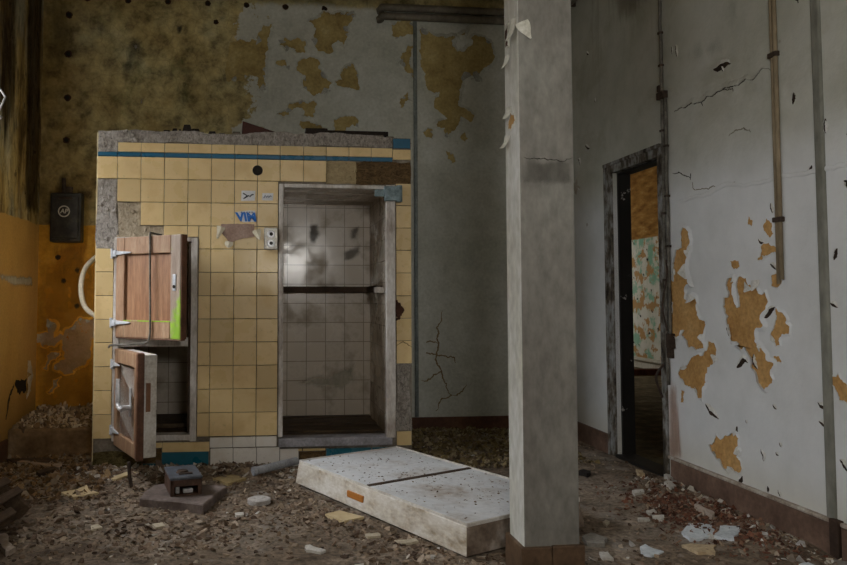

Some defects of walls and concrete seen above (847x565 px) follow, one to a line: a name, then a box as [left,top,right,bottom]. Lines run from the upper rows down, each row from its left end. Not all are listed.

water stain [1,0,16,138]
water stain [26,0,42,211]
peeling [98,10,394,152]
peeling [326,161,411,185]
peeling [390,20,510,164]
crack [674,67,770,112]
peeling [14,316,94,402]
crack [397,312,467,411]
peeling [671,224,719,405]
peeling [722,203,792,393]
peeling [708,420,748,481]